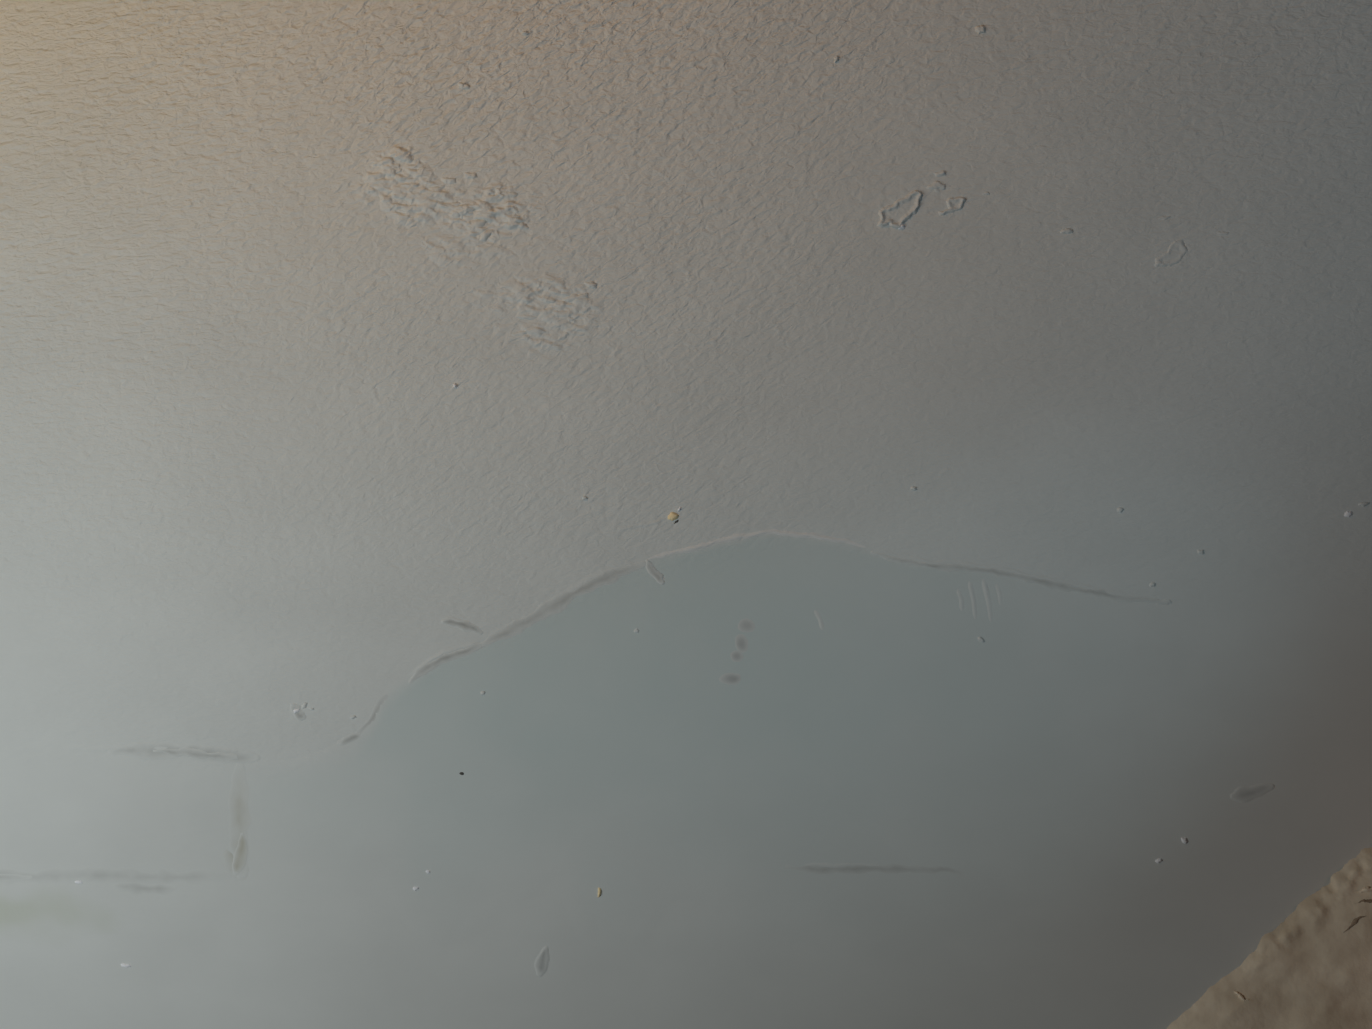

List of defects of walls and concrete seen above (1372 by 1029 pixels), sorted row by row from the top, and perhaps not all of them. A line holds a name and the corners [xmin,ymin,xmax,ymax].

peeling [876,170,990,230]